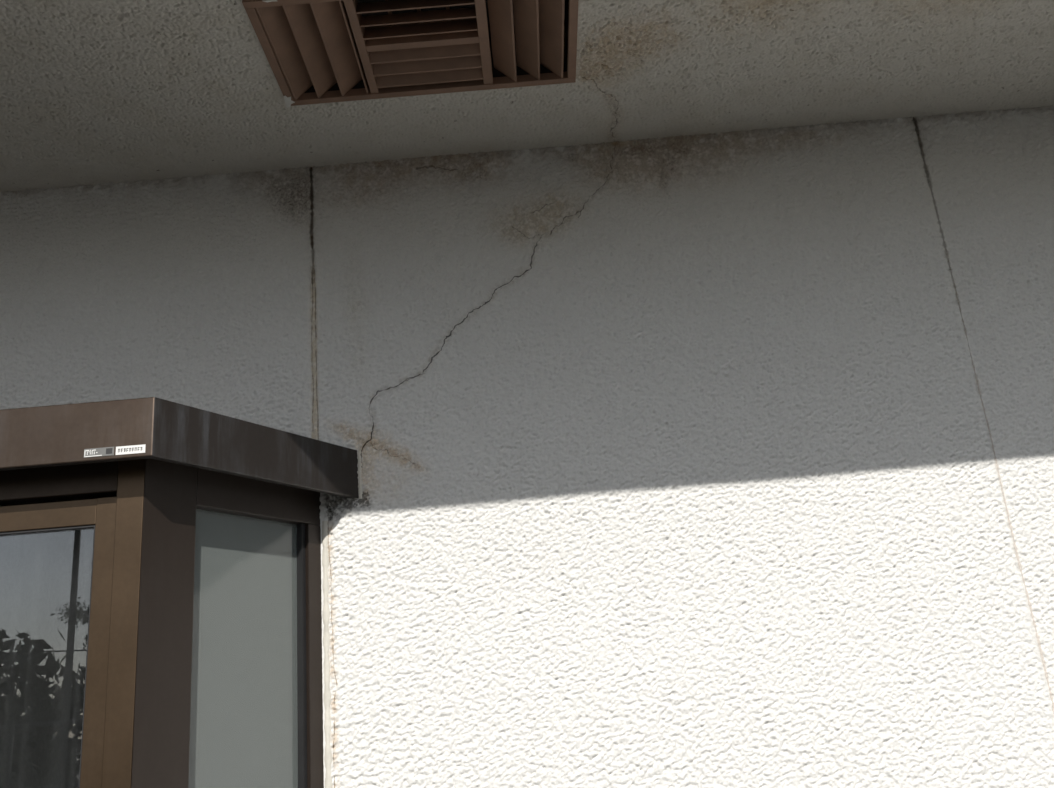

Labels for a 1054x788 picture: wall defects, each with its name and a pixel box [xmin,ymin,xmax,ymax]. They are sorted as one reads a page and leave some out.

crack [361,202,586,467]